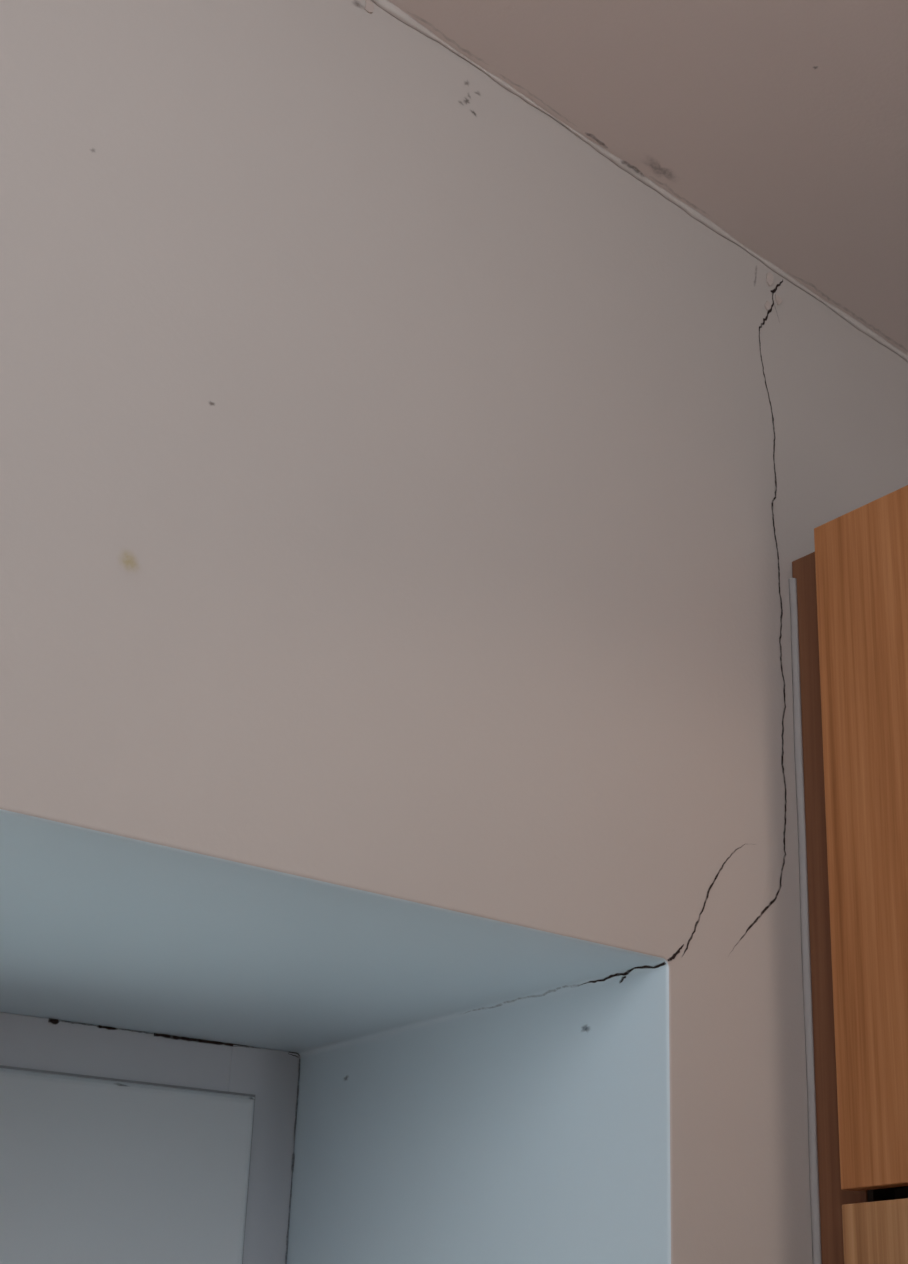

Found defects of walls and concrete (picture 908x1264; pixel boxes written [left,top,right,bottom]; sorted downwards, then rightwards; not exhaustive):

crack [581,844,745,985]
crack [731,272,787,952]